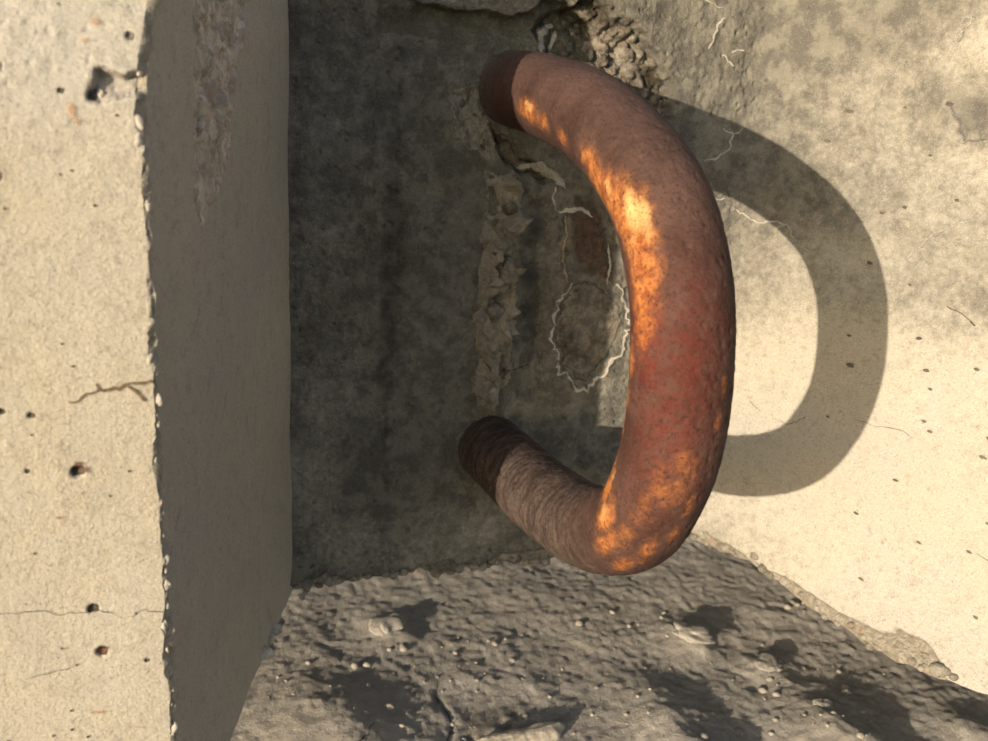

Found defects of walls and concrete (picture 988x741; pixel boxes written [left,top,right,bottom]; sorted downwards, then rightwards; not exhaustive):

spalling [376,0,664,114]
spalling [447,84,566,189]
corrosion [561,197,613,286]
crack [69,380,153,403]
crack [0,609,164,617]
crack [434,668,460,741]